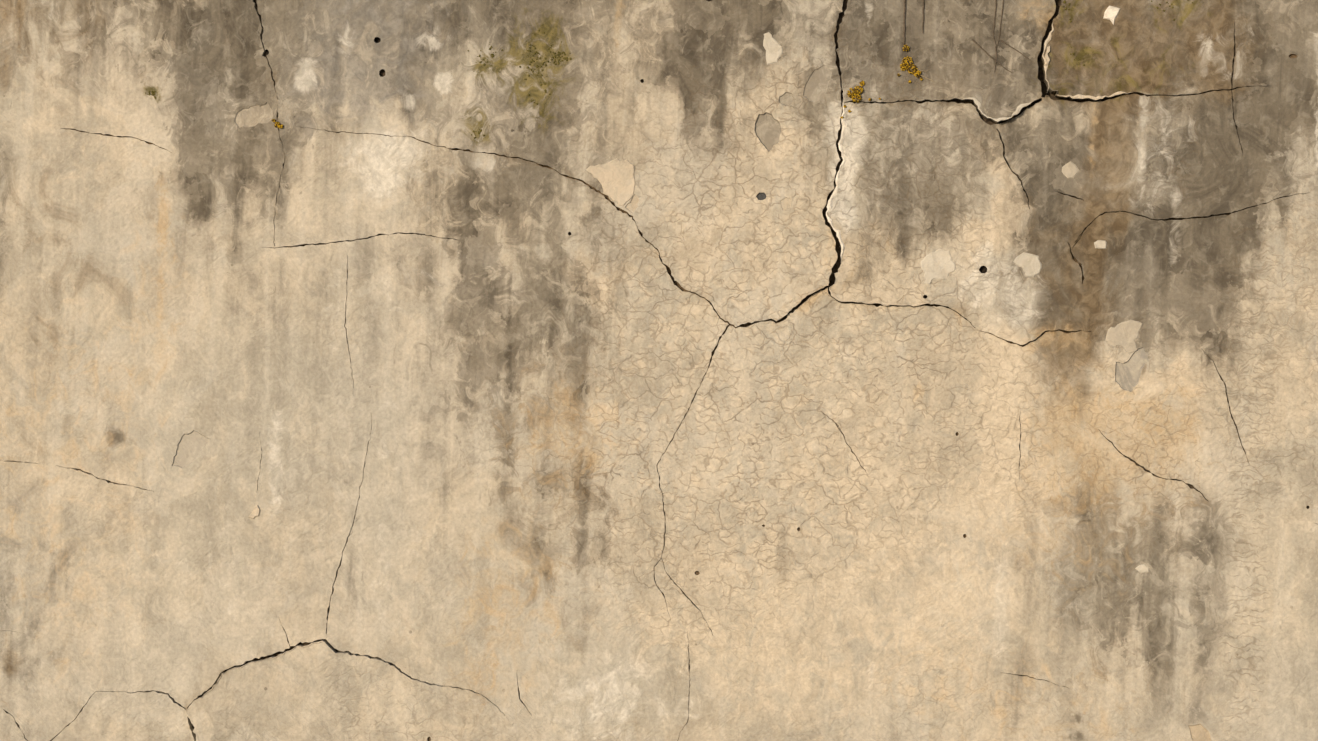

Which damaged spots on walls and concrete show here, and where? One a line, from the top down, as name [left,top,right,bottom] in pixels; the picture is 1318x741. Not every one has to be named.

crack [254,0,275,82]
flaking render [754,0,1154,260]
peeling [585,158,639,214]
peeling [829,248,967,319]
peeling [1013,252,1042,278]
crack [1061,193,1306,283]
leakage [111,0,676,741]
crack [266,0,1266,741]
leakage [630,0,1318,741]
spalling [1105,320,1149,392]
leakage [100,423,133,451]
crack [132,497,414,735]